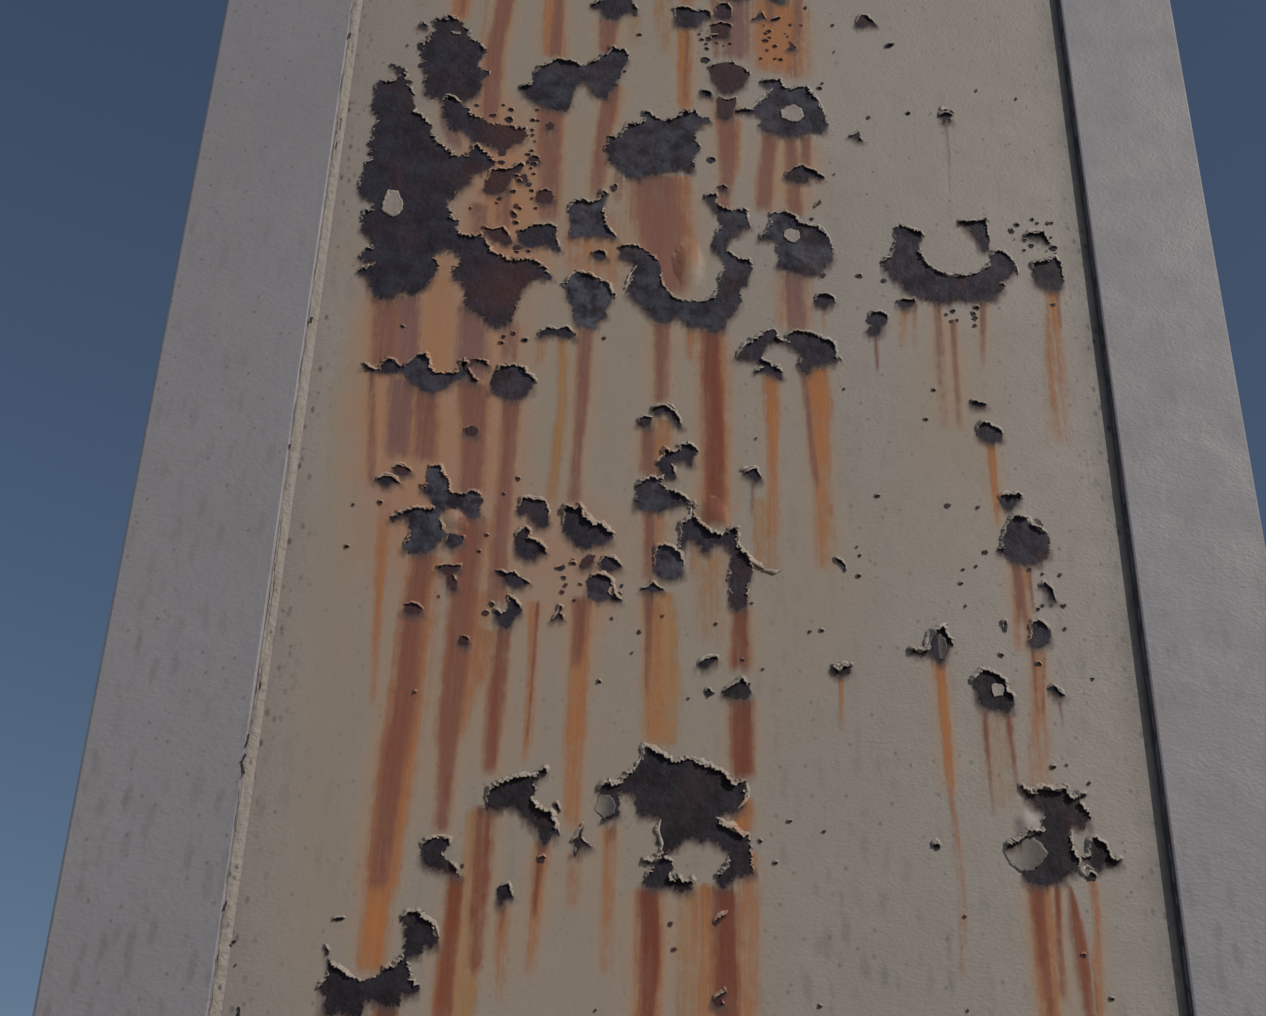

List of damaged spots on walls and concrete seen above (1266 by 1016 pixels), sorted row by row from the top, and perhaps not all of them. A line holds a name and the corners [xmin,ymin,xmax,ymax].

peeling [356,0,836,344]
rust [472,108,615,501]
peeling [866,217,1065,337]
rust [357,257,520,969]
peeling [482,475,623,630]
rust [687,329,727,523]
peeling [634,402,784,612]
peeling [316,907,440,1016]
rust [433,806,507,1016]
rust [636,888,662,1016]
peeling [594,742,763,895]
rust [730,699,755,778]